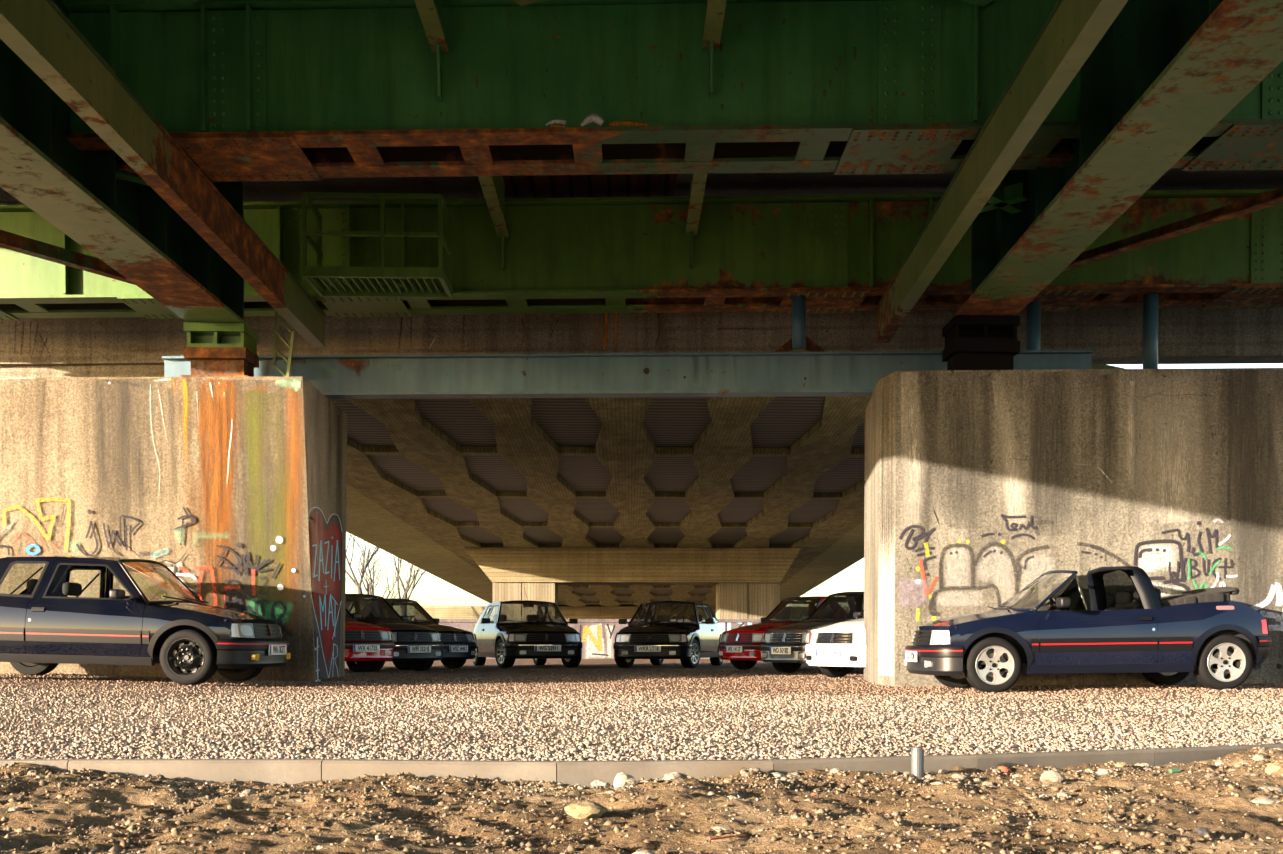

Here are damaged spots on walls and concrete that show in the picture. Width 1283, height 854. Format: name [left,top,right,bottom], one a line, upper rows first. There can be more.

rust [173,379,233,583]
water stain [227,422,304,681]
water stain [1228,370,1271,626]